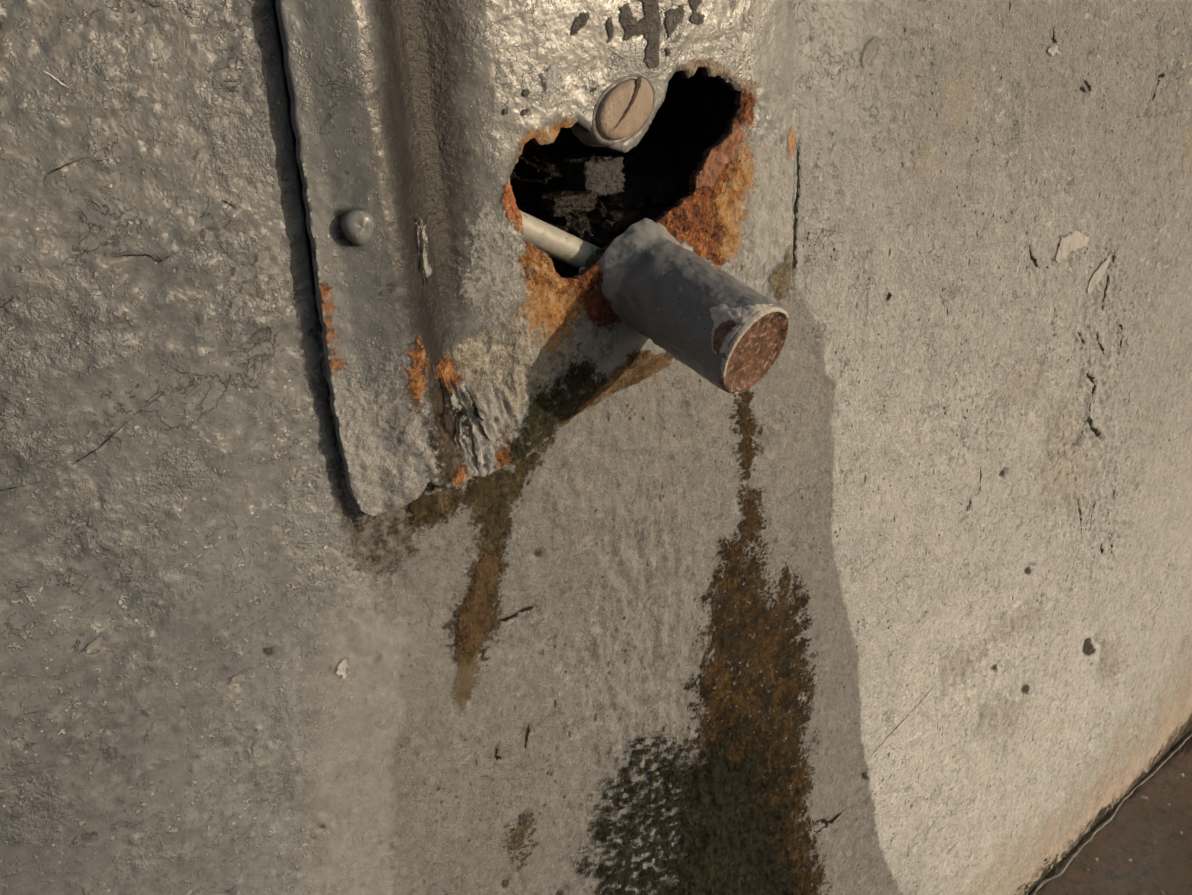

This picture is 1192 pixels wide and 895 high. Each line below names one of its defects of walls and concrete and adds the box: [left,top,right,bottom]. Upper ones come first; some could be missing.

corrosion [517,116,575,163]
corrosion [655,58,759,270]
corrosion [501,181,621,353]
crack [1029,245,1038,267]
corrosion [320,282,348,376]
corrosion [403,335,465,413]
crack [441,374,490,473]
corrosion [495,431,514,470]
corrosion [557,347,674,431]
leakage [727,389,770,559]
crack [1077,255,1123,438]
leakage [651,710,812,895]